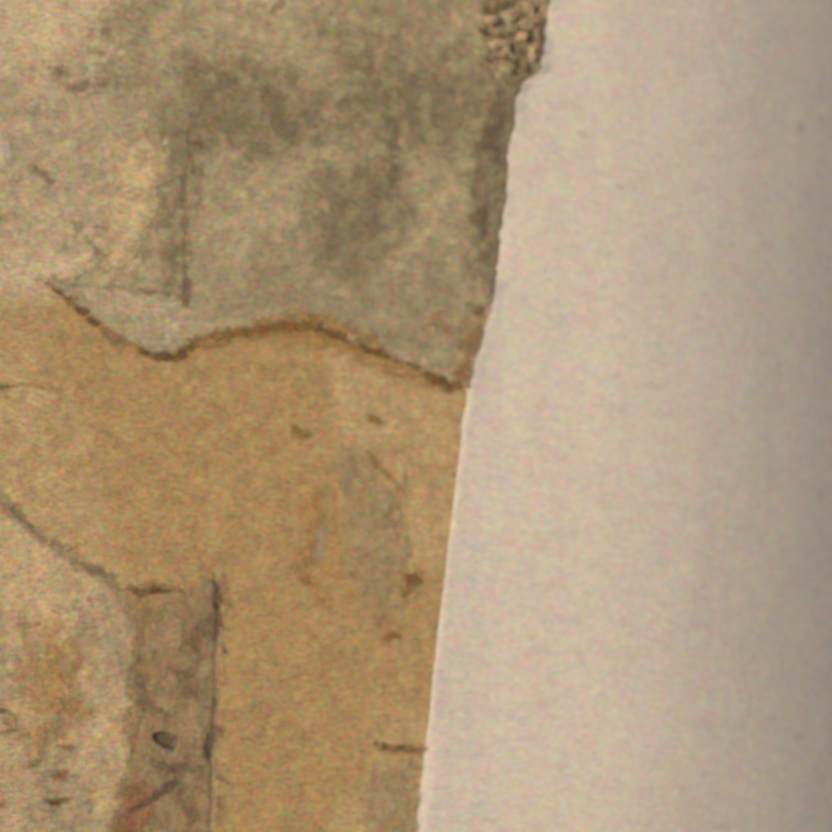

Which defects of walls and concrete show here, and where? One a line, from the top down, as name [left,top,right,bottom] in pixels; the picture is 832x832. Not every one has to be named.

water stain [180,66,310,151]
peeling [46,0,551,388]
water stain [317,160,407,274]
water stain [338,51,519,292]